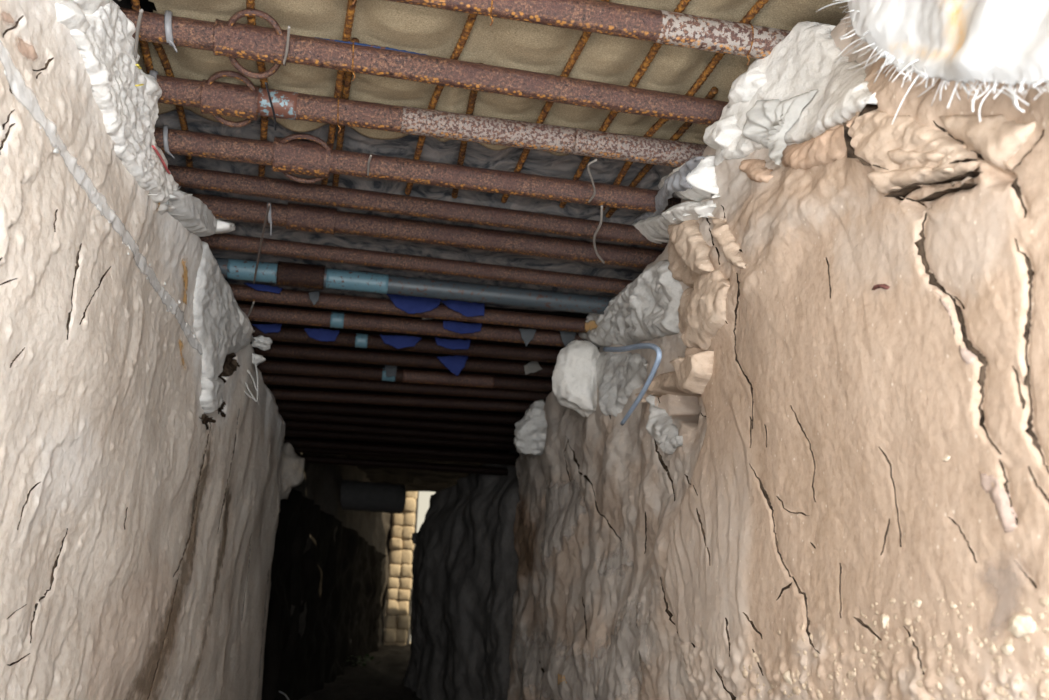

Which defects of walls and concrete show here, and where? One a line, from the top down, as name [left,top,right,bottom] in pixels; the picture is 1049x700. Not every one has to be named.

crack [2,15,24,38]
crack [32,57,54,79]
crack [0,84,16,155]
crack [66,243,112,340]
crack [842,104,1049,525]
spalling [935,292,977,365]
crack [706,205,820,654]
crack [879,447,902,555]
spalling [980,471,1018,533]
crack [7,528,68,666]
crack [839,563,882,641]
crack [715,612,764,700]